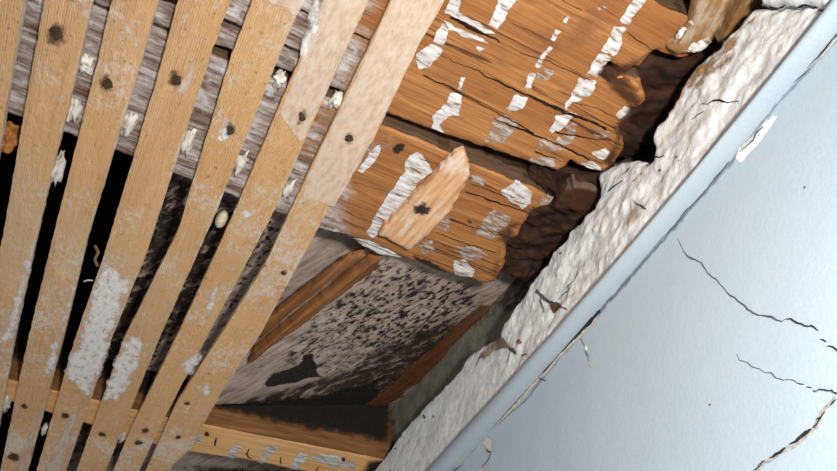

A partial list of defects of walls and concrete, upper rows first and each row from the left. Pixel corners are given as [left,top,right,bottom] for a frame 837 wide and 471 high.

damp [13,314,32,360]
damp [56,329,78,371]
damp [215,255,532,441]
crack [494,309,600,428]
crack [535,272,578,313]
flaking render [375,7,823,471]
crack [656,161,837,350]
crack [737,355,837,471]